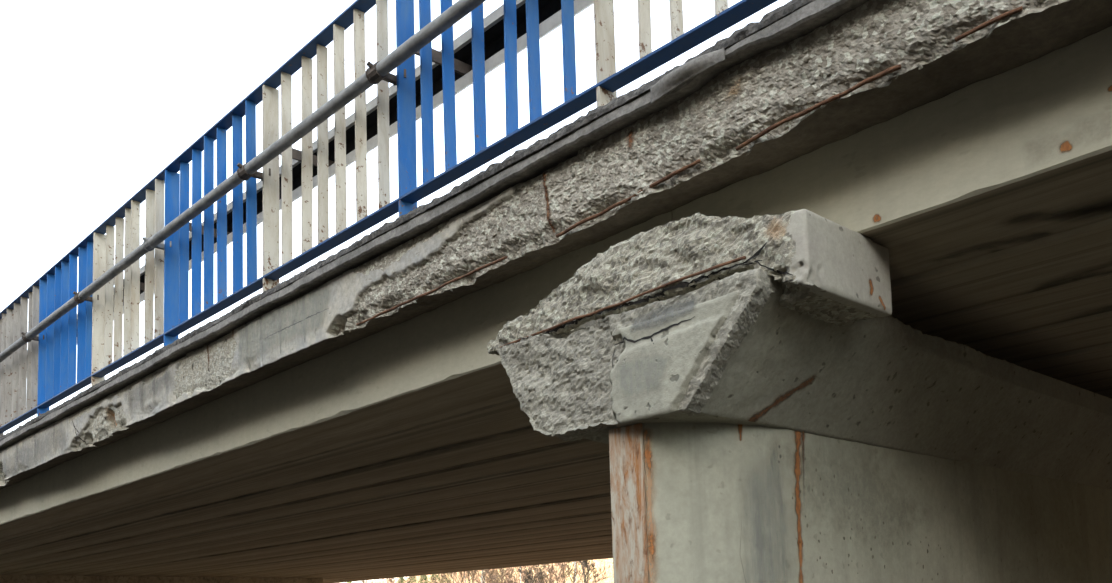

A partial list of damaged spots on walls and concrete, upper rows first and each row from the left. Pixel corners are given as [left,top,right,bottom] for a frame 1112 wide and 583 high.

spalling [329,0,1070,338]
spalling [0,463,8,486]
spalling [73,403,128,451]
spalling [173,333,237,398]
rust [643,430,655,583]
spalling [487,211,881,444]
rust [738,375,816,441]
rust [794,431,804,583]